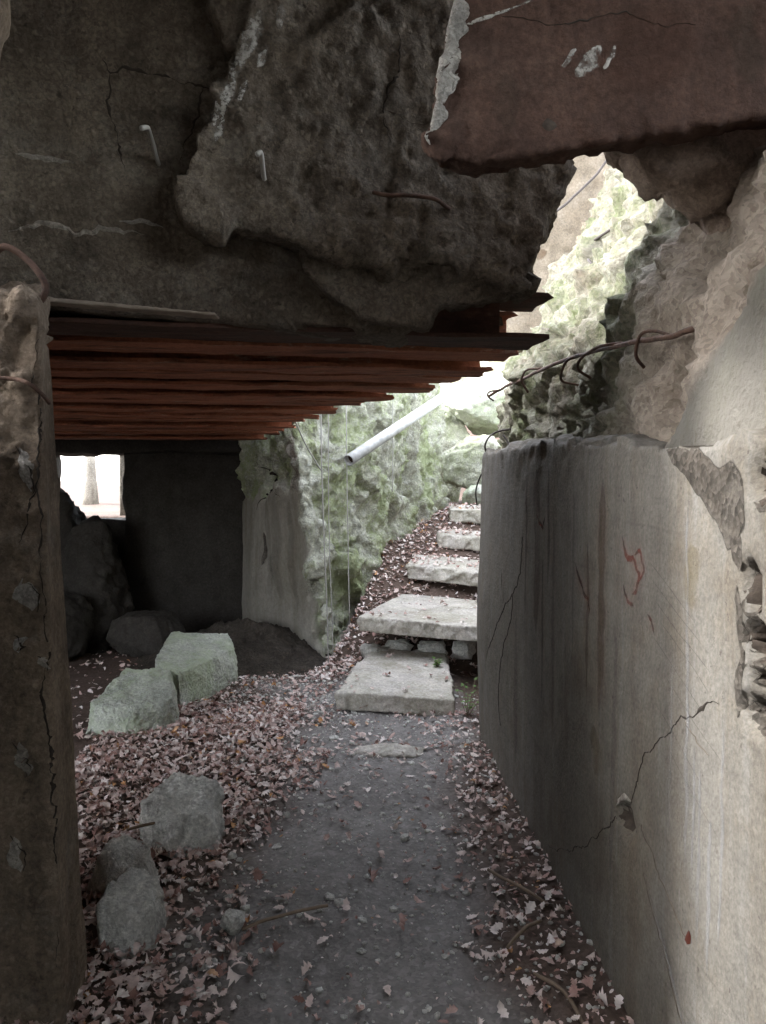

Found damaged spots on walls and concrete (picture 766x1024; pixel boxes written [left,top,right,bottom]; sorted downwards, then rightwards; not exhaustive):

crack [102,58,209,168]
spalling [424,0,530,145]
crack [502,10,695,27]
crack [19,339,58,864]
crack [487,549,522,719]
peeling [667,445,766,736]
crack [547,701,718,1024]